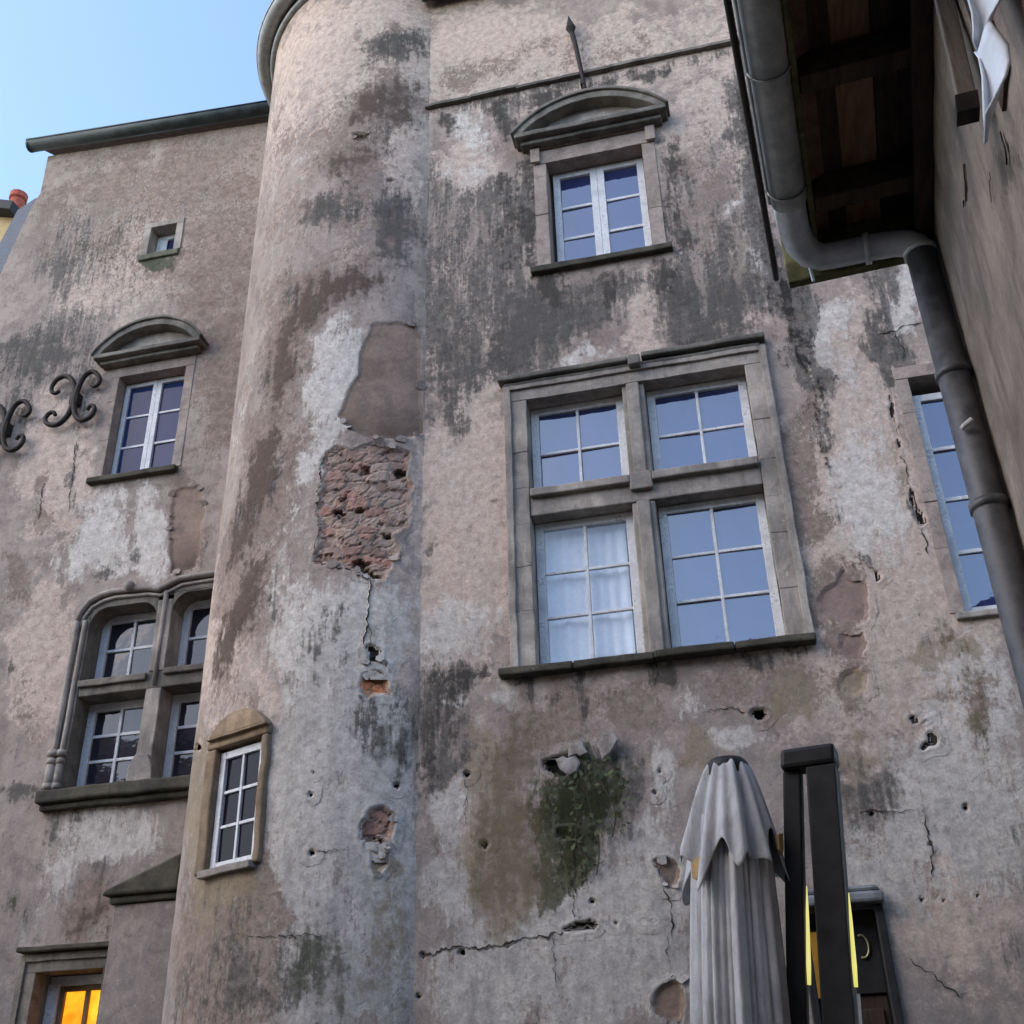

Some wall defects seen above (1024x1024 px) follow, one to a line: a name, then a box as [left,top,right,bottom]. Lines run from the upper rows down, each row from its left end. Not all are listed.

leakage [335,32,428,135]
leakage [628,65,671,84]
leakage [424,160,626,432]
leakage [652,137,835,470]
peeling [164,480,211,580]
flaking render [306,316,426,587]
crack [889,395,928,554]
peeling [808,556,892,706]
crack [421,831,606,986]
peeling [641,966,690,1024]
crack [862,808,934,876]
crack [910,959,967,999]